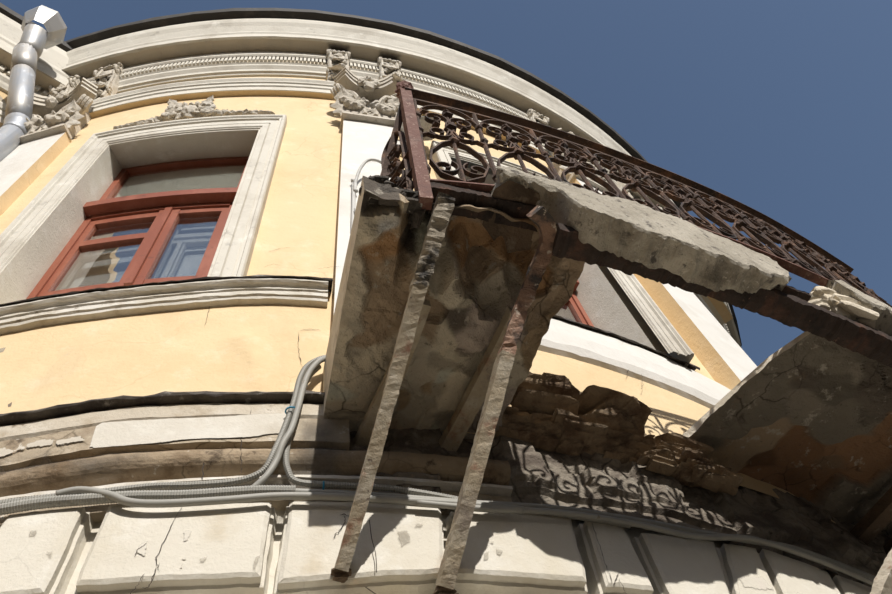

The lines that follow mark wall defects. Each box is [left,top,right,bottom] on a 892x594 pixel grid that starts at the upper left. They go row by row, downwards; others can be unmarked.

spalling [359,175,425,228]
spalling [495,166,792,294]
peeling [0,413,298,457]
flaking render [383,428,474,458]
flaking render [376,471,442,494]
flaking render [488,371,891,590]
crack [130,509,181,594]